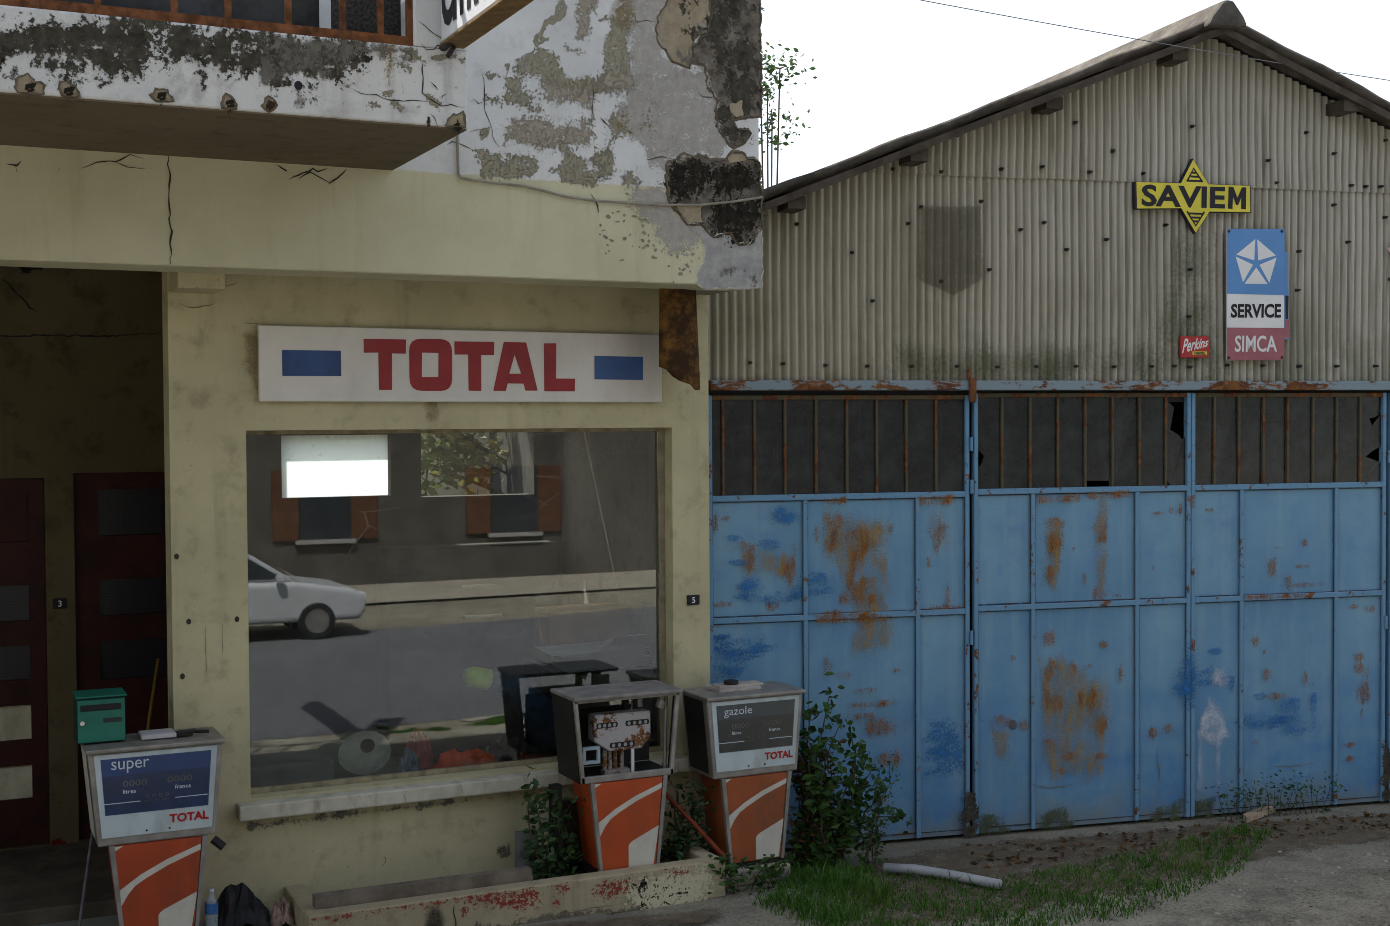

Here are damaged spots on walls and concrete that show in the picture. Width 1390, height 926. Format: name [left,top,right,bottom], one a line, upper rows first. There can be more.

peeling [390,46,466,74]
spalling [14,73,81,100]
spalling [149,87,175,106]
spalling [220,92,238,114]
spalling [260,95,278,113]
peeling [366,90,405,112]
peeling [425,0,768,290]
crack [59,154,173,264]
corrosion [741,541,796,591]
corrosion [813,497,893,653]
corrosion [982,630,1122,783]